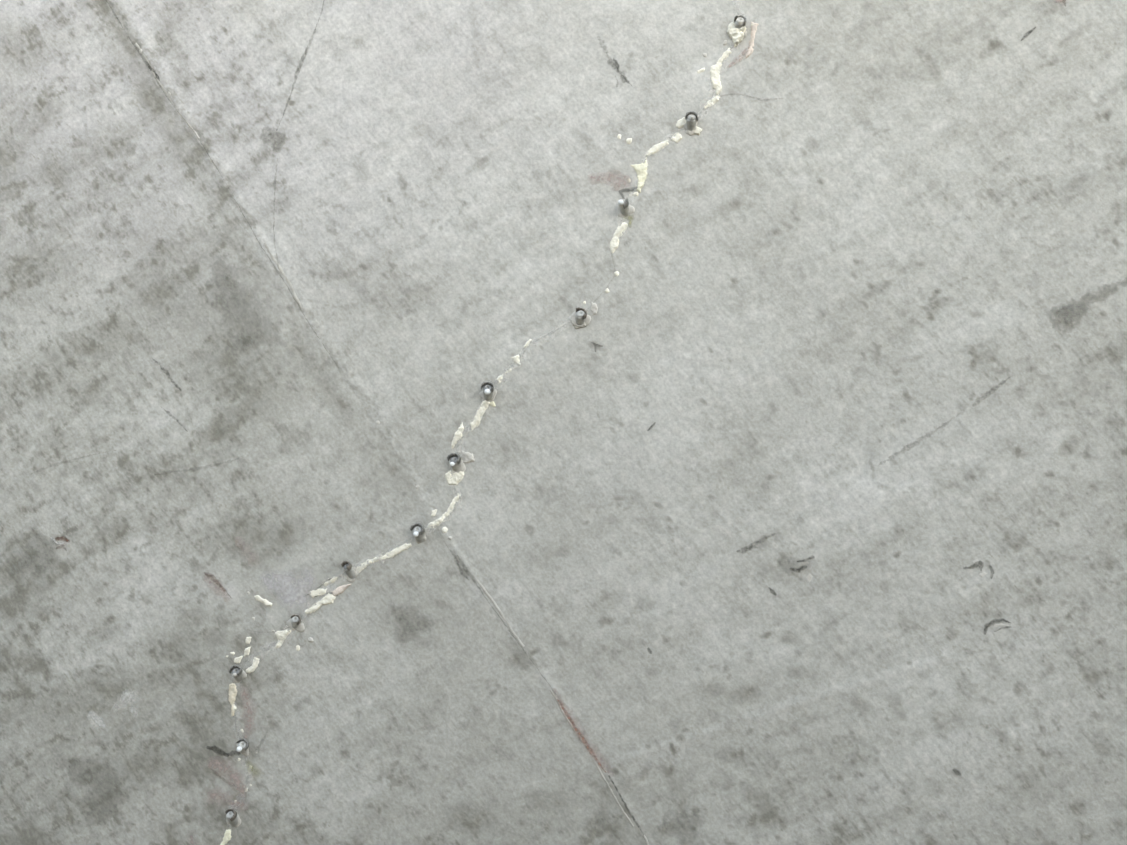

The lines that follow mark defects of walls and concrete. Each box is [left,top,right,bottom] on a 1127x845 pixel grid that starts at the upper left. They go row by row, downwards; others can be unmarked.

crack [135,43,213,163]
crack [550,690,650,845]